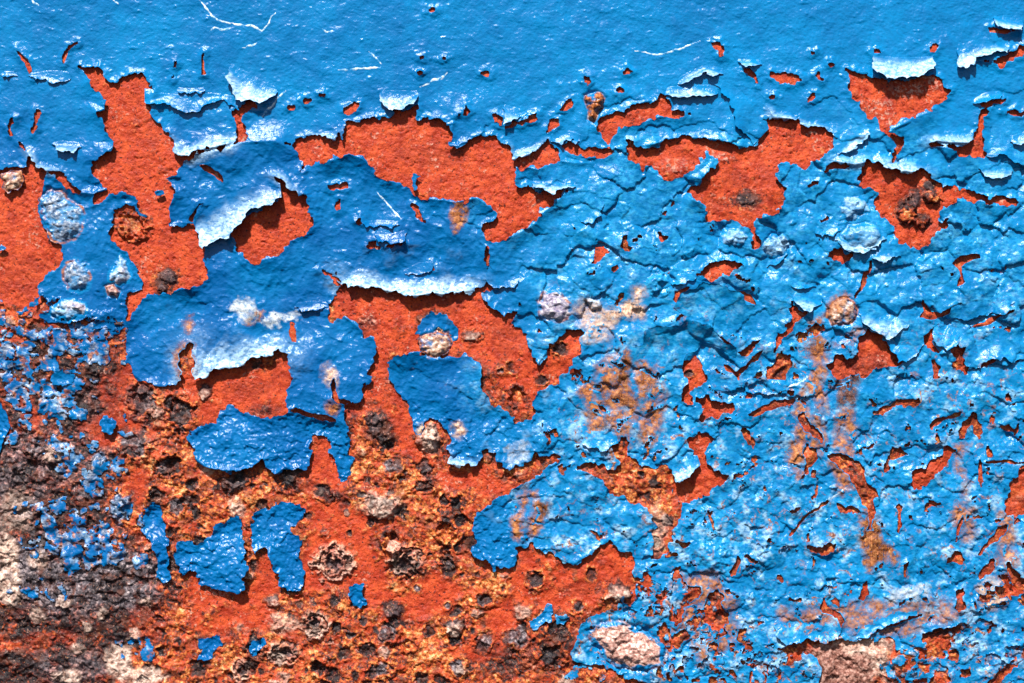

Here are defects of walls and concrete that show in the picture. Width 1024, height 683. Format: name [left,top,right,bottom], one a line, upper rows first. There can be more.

peeling [0,42,1024,504]
crack [714,337,763,380]
peeling [118,417,468,661]
corrosion [0,282,1024,683]
crack [729,555,741,576]
crack [748,395,798,417]
crack [789,500,829,536]
crack [801,443,908,530]
crack [929,412,962,434]
crack [955,515,1007,556]
crack [978,423,1024,487]
peeling [458,533,635,664]